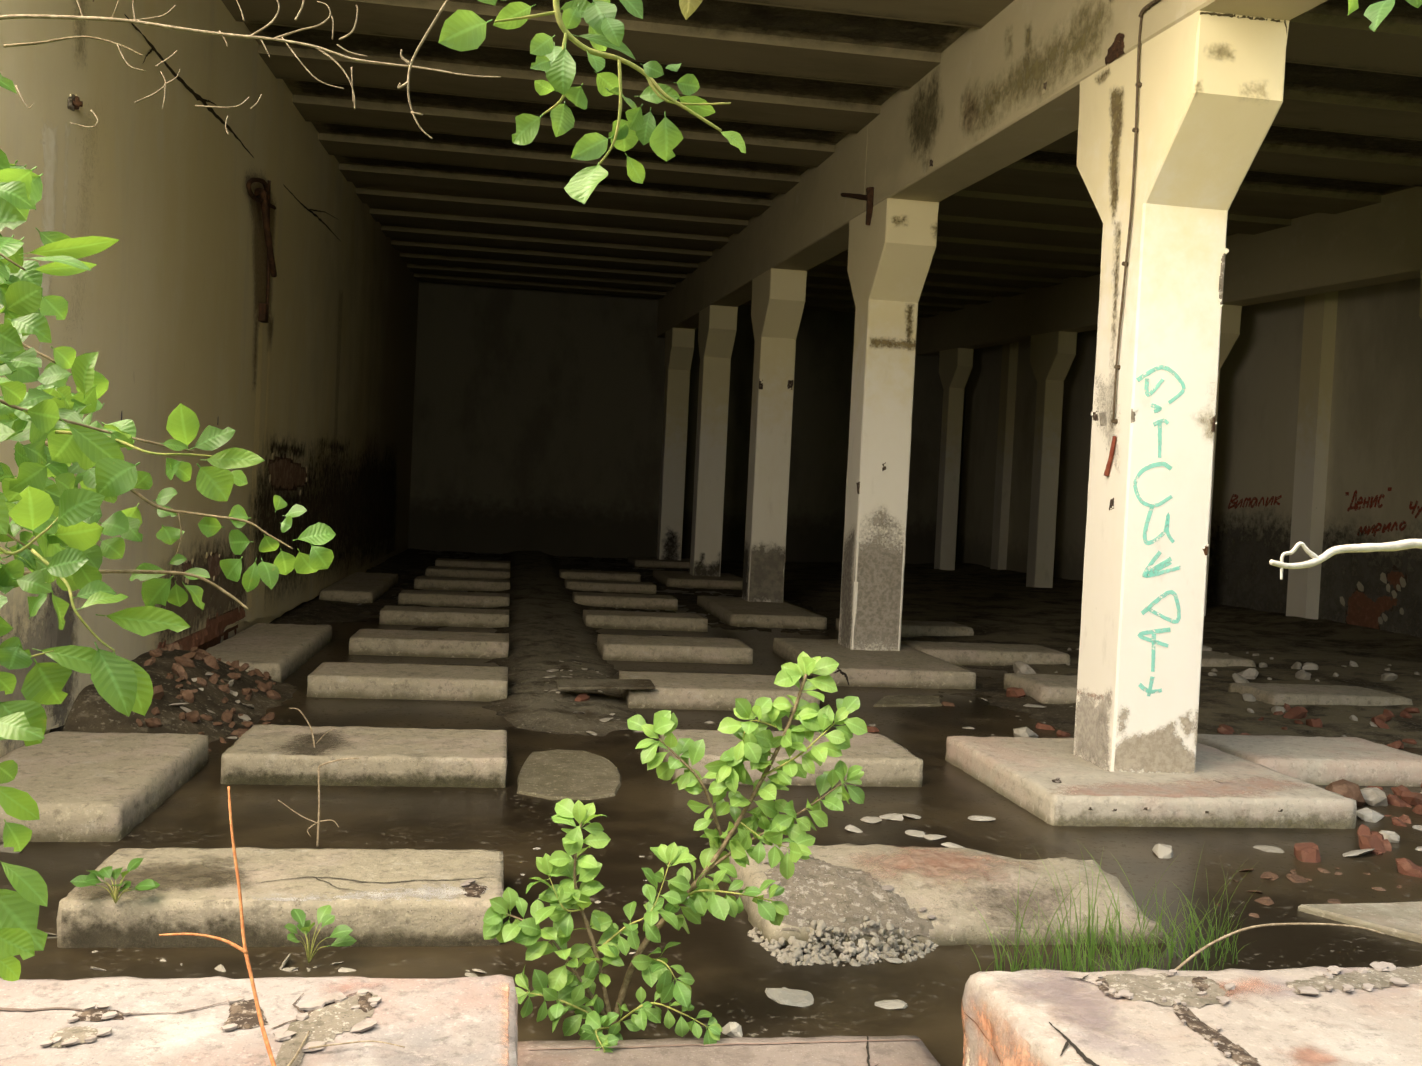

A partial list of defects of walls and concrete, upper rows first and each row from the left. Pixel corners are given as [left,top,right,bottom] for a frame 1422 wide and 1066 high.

crack [124,14,254,158]
leakage [972,5,1104,127]
corrosion [246,177,275,378]
leakage [742,545,785,603]
leakage [839,512,903,651]
spalling [1286,961,1422,995]
spalling [40,1003,130,1048]
spalling [220,989,382,1066]
crack [527,1036,920,1066]
crack [964,1012,1004,1066]
crack [1049,1022,1100,1066]
spalling [1096,969,1261,1066]